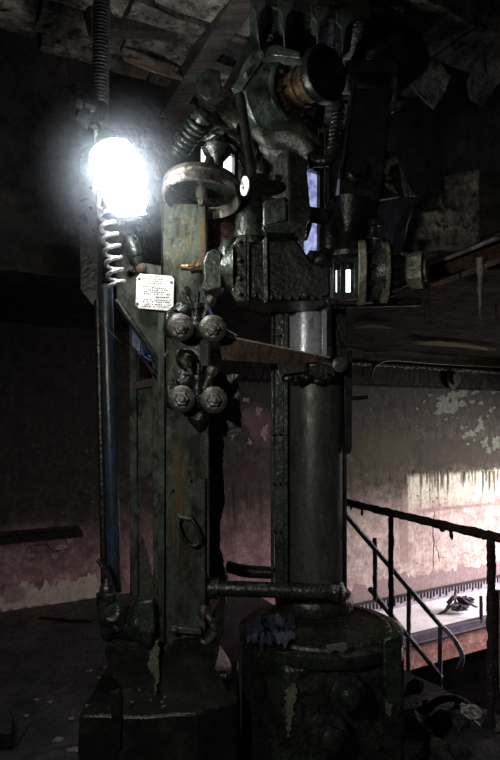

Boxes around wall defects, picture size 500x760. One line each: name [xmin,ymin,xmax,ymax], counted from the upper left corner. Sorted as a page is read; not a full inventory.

peeling [416,390,500,454]
damp [417,438,499,512]
spalling [0,560,101,612]